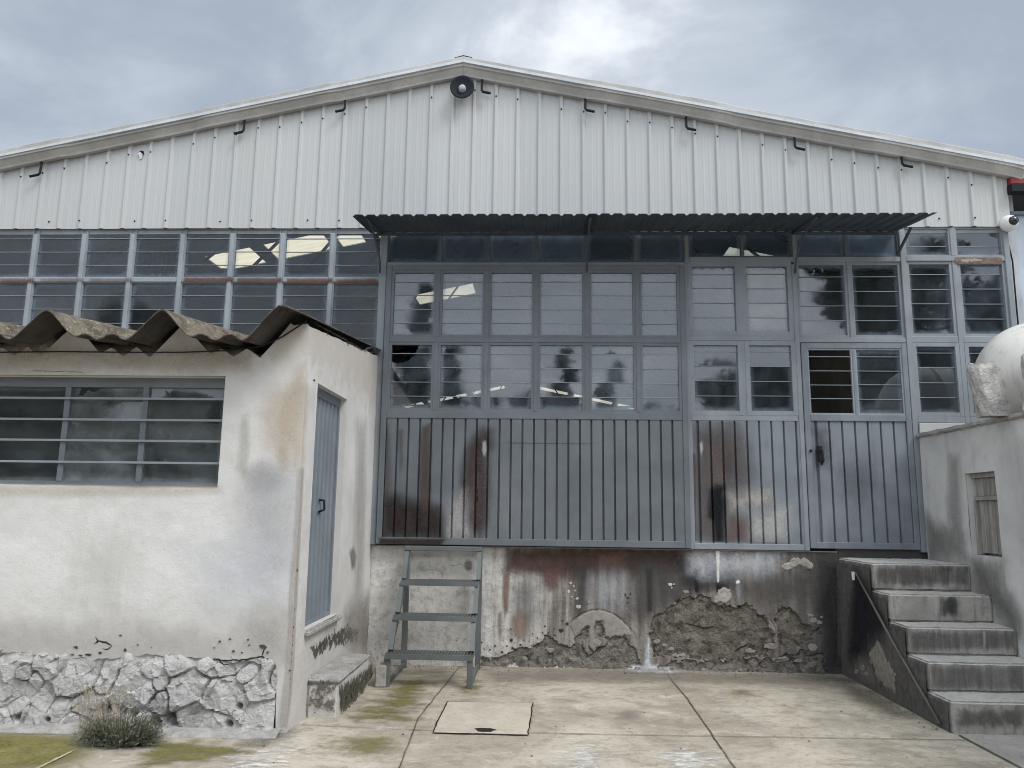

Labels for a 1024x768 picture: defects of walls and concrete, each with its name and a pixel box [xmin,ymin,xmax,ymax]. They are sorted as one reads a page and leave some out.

corrosion [499,548,688,632]
crack [213,647,276,666]
peeling [311,623,358,658]
spalling [481,620,641,670]
spalling [649,583,827,673]